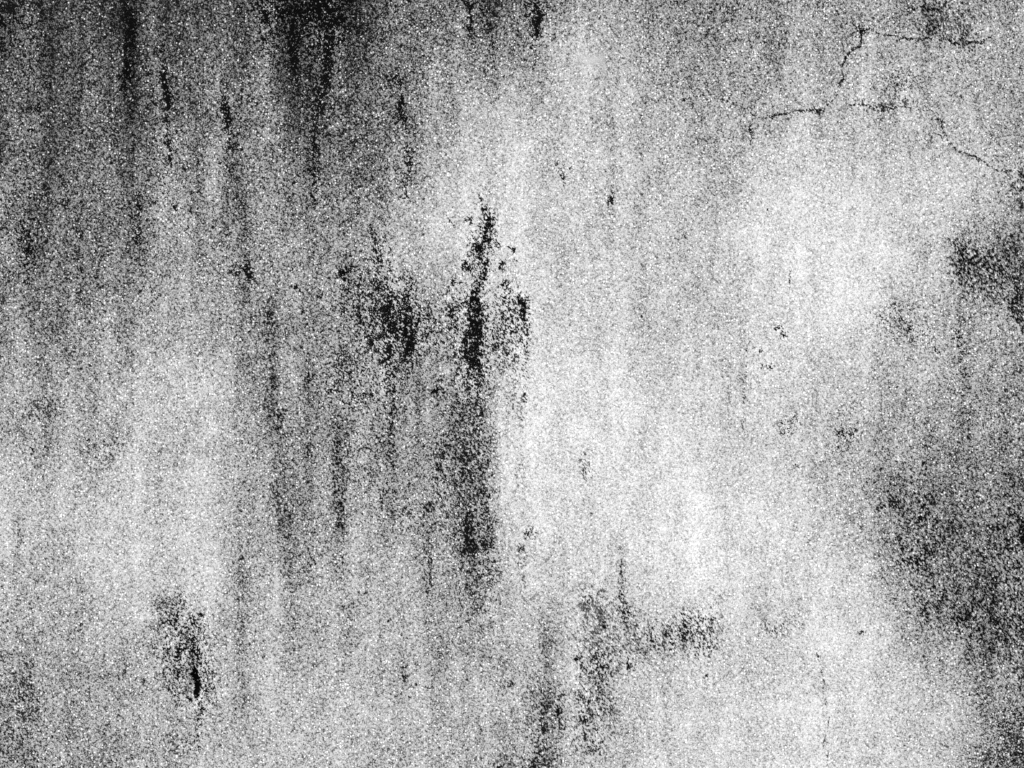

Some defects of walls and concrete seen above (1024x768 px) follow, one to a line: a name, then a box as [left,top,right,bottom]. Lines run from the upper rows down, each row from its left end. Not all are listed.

water stain [15,204,42,285]
water stain [129,65,181,257]
water stain [222,121,253,240]
water stain [261,0,351,231]
crack [649,25,1022,172]
water stain [879,303,941,355]
water stain [948,234,1024,333]
water stain [245,297,291,577]
water stain [302,194,530,624]
water stain [871,474,1024,679]
water stain [0,668,43,768]
water stain [979,699,1024,768]